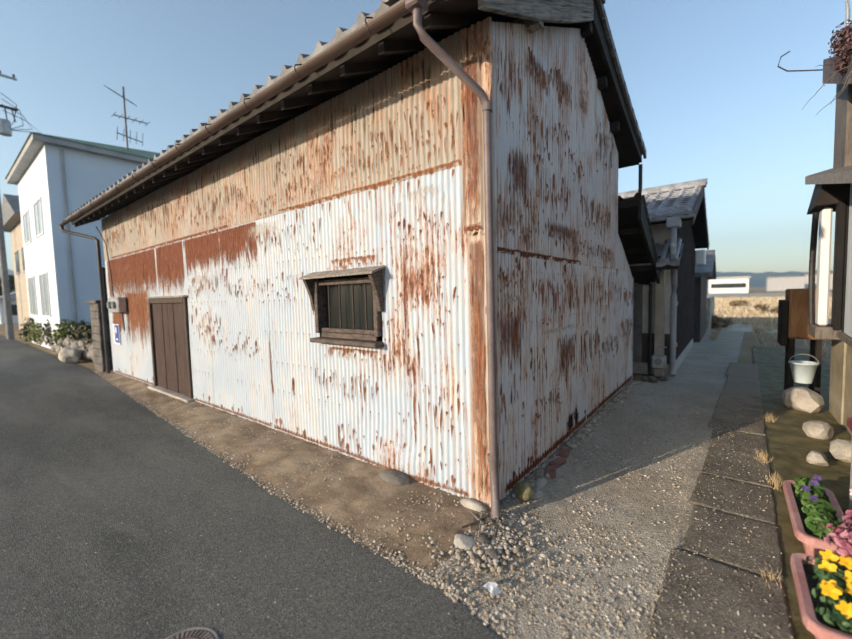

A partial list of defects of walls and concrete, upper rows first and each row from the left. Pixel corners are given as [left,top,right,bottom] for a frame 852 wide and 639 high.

rust [497,47,572,116]
rust [105,55,482,349]
rust [497,116,634,325]
rust [229,332,274,393]
rust [315,241,485,498]
rust [498,312,547,419]
rust [535,316,634,418]
rust [195,393,391,469]
rust [505,376,632,493]